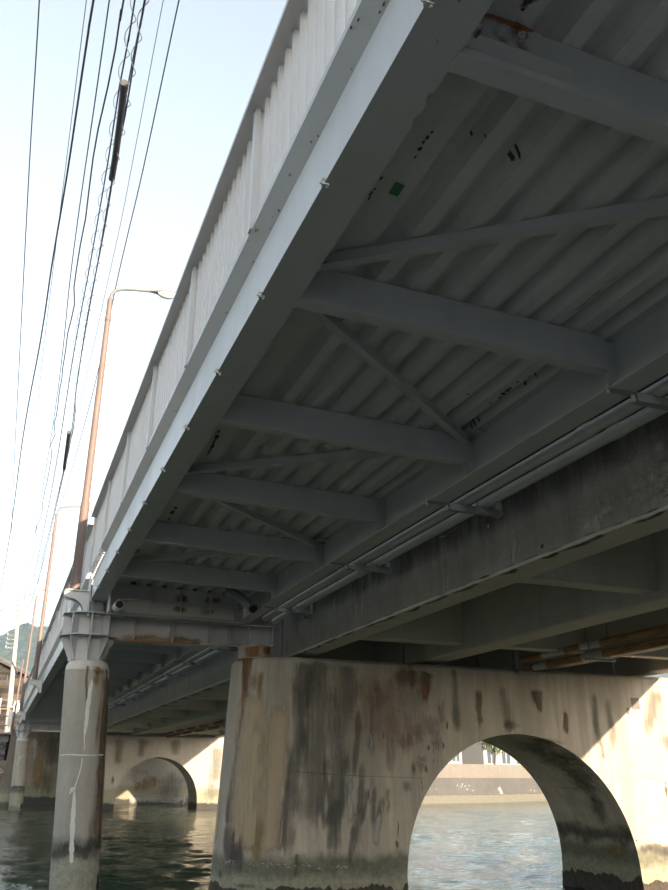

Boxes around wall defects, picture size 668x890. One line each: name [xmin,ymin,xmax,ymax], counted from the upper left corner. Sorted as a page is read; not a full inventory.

corrosion [484,13,533,50]
corrosion [241,646,270,715]
corrosion [395,667,430,700]
water stain [532,691,542,711]
water stain [214,618,381,868]
water stain [51,679,226,863]
water stain [557,823,633,845]
water stain [641,844,668,856]